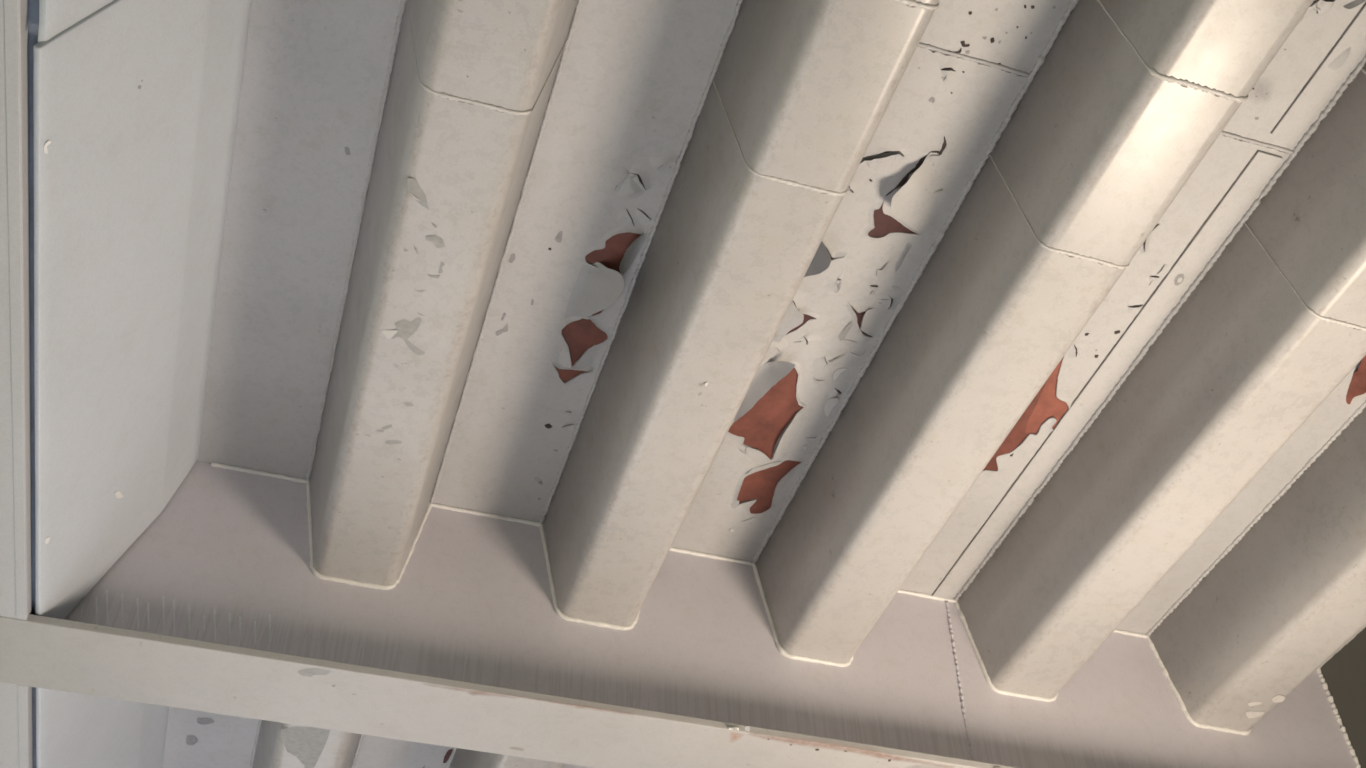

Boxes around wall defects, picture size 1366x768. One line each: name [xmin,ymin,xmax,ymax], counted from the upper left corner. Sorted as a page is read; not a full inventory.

peeling [547,225,649,386]
peeling [726,135,957,533]
peeling [981,352,1072,474]
peeling [1346,355,1366,404]